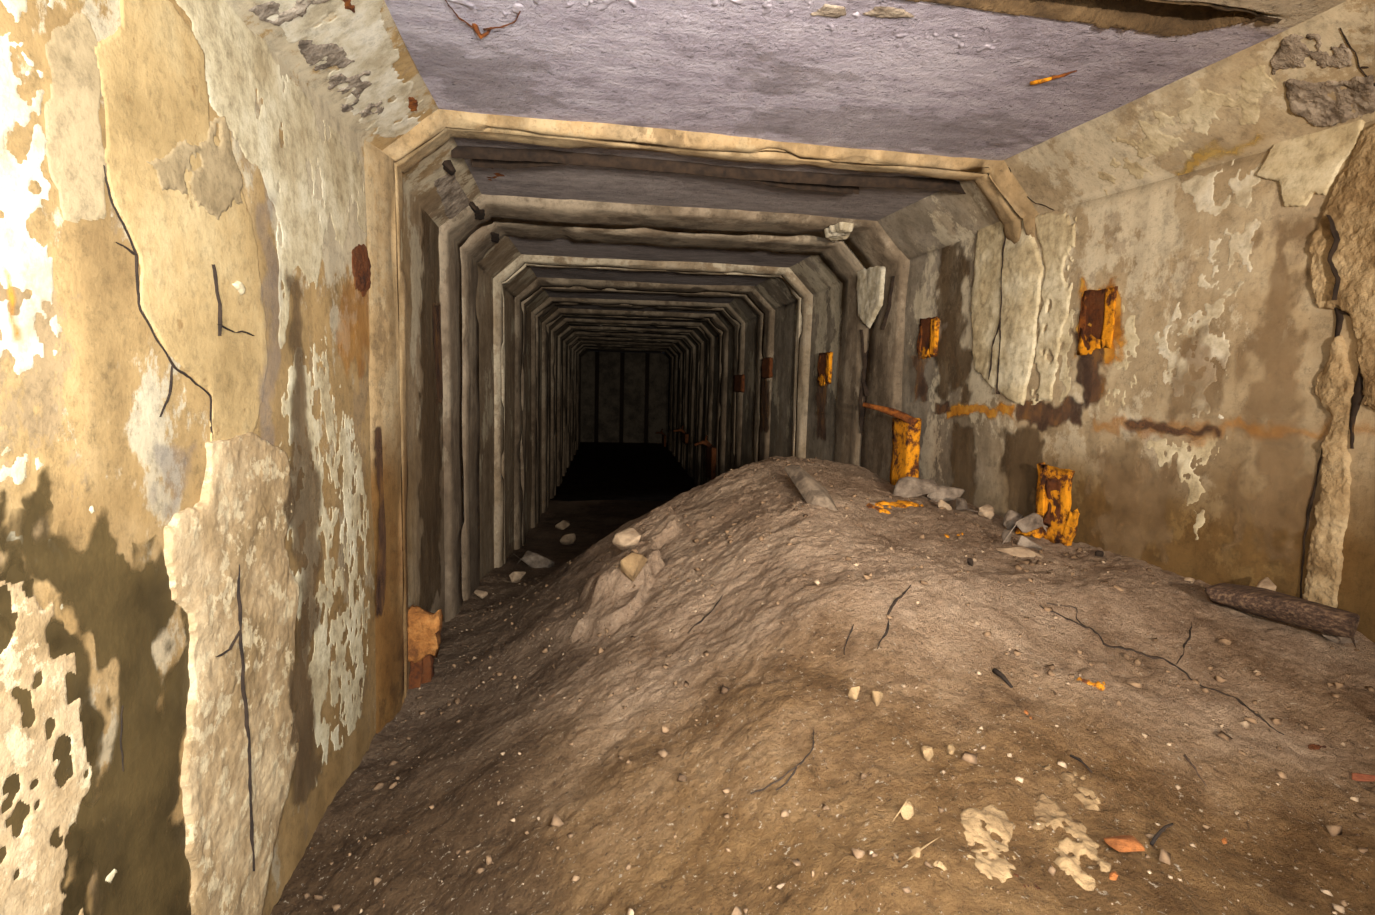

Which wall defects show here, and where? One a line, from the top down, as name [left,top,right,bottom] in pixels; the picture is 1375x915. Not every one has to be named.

water stain [0,470,191,915]
crack [103,165,213,439]
flaking render [0,0,425,915]
crack [211,264,255,336]
crack [215,564,255,871]
rust [408,605,443,689]
spalling [434,160,500,243]
rust [913,278,1124,432]
flaking render [762,0,1375,608]
rust [1062,509,1080,546]